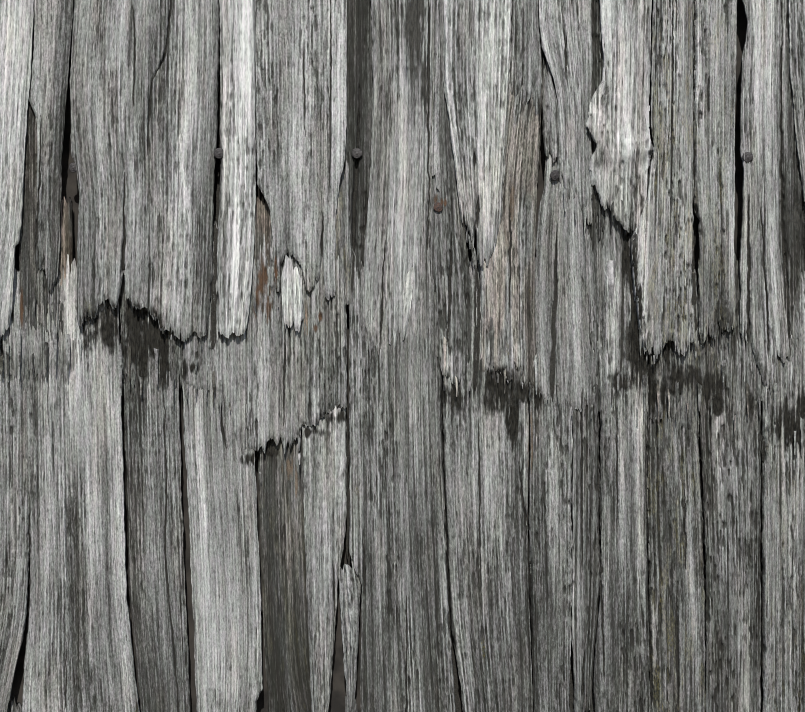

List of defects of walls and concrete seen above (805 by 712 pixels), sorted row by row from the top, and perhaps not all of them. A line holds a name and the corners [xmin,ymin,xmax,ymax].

crack [34,115,42,257]